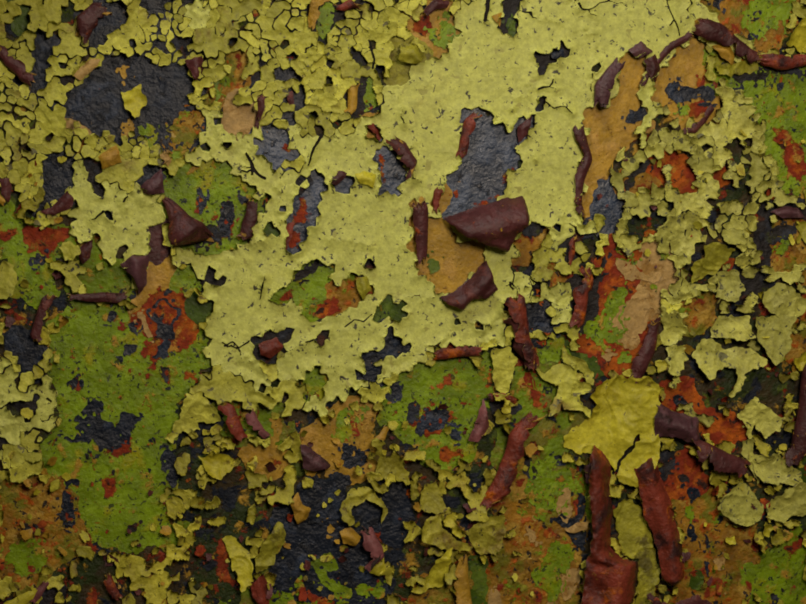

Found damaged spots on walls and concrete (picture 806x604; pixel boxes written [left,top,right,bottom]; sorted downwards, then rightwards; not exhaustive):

crack [482,0,490,22]
crack [308,134,324,166]
crack [241,152,266,180]
peeling [525,443,544,457]
crack [611,434,639,475]
peeling [351,499,383,533]
peeling [20,528,34,541]
peeling [194,545,214,561]